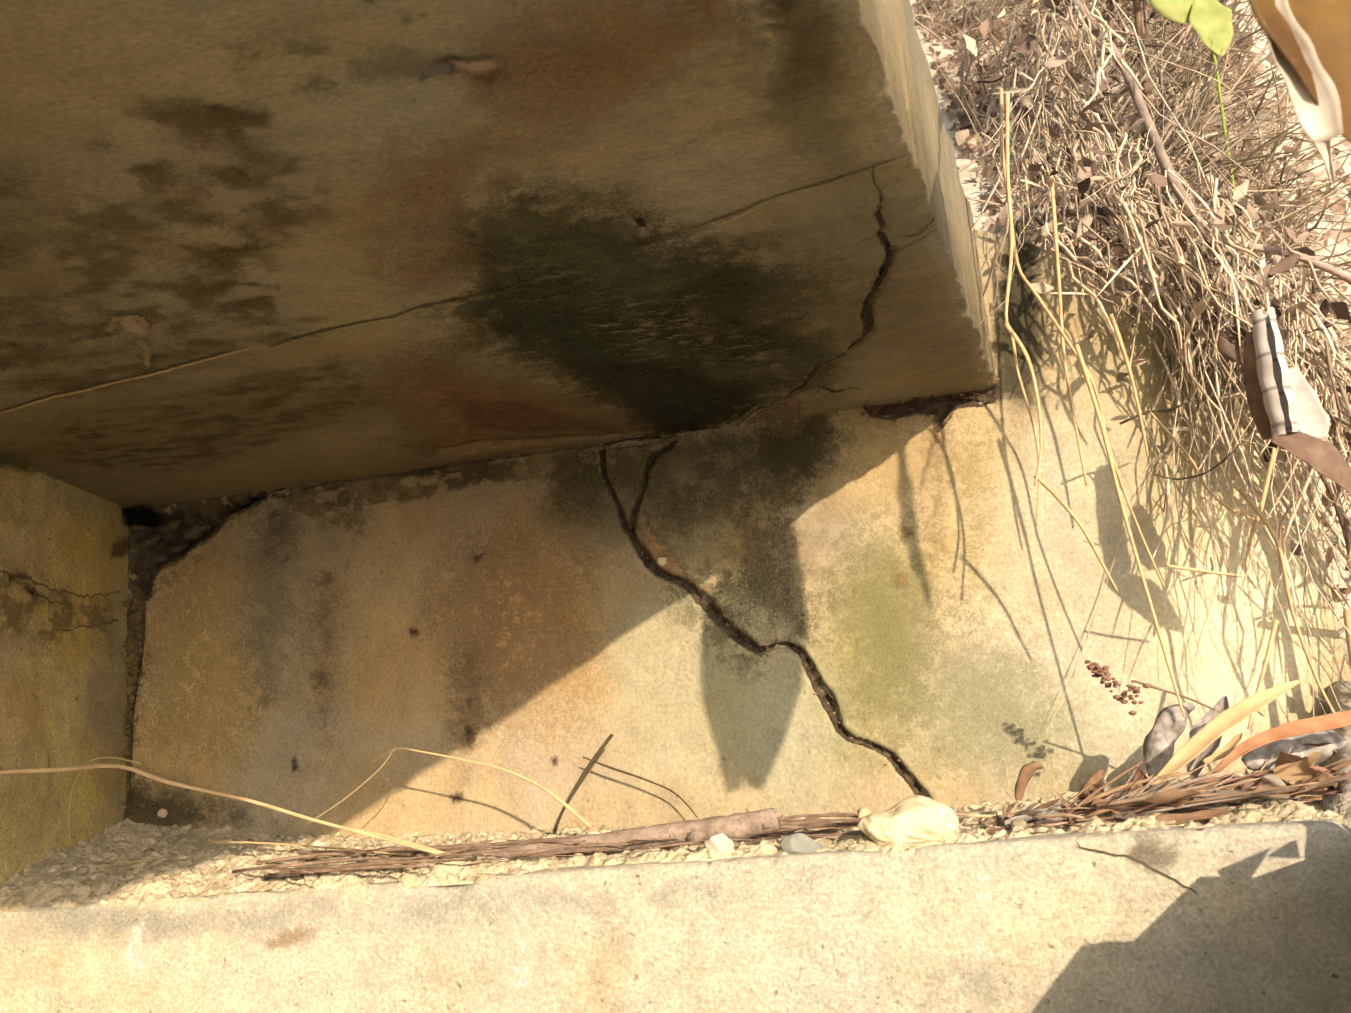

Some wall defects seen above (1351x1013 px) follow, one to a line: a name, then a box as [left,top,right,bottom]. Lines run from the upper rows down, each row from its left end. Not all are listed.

leakage [142,103,295,189]
leakage [0,164,299,390]
crack [266,285,518,349]
crack [691,153,938,425]
crack [0,570,120,631]
crack [255,434,930,798]
leakage [729,509,805,634]